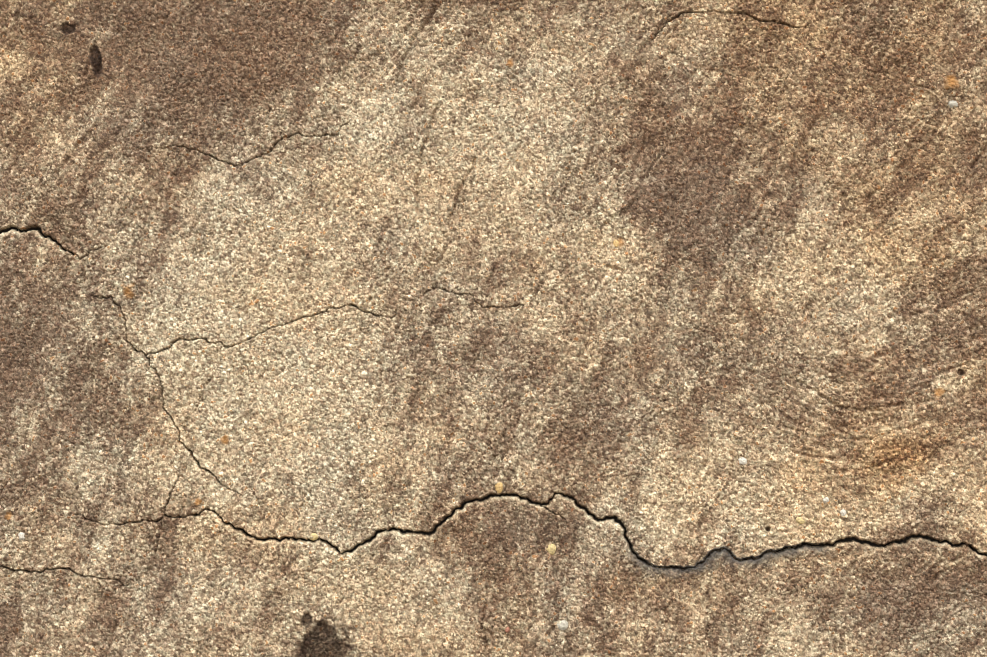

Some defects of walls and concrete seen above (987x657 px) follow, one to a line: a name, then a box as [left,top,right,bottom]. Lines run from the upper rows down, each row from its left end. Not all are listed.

crack [0,226,100,260]
crack [79,297,987,570]
crack [0,566,127,586]